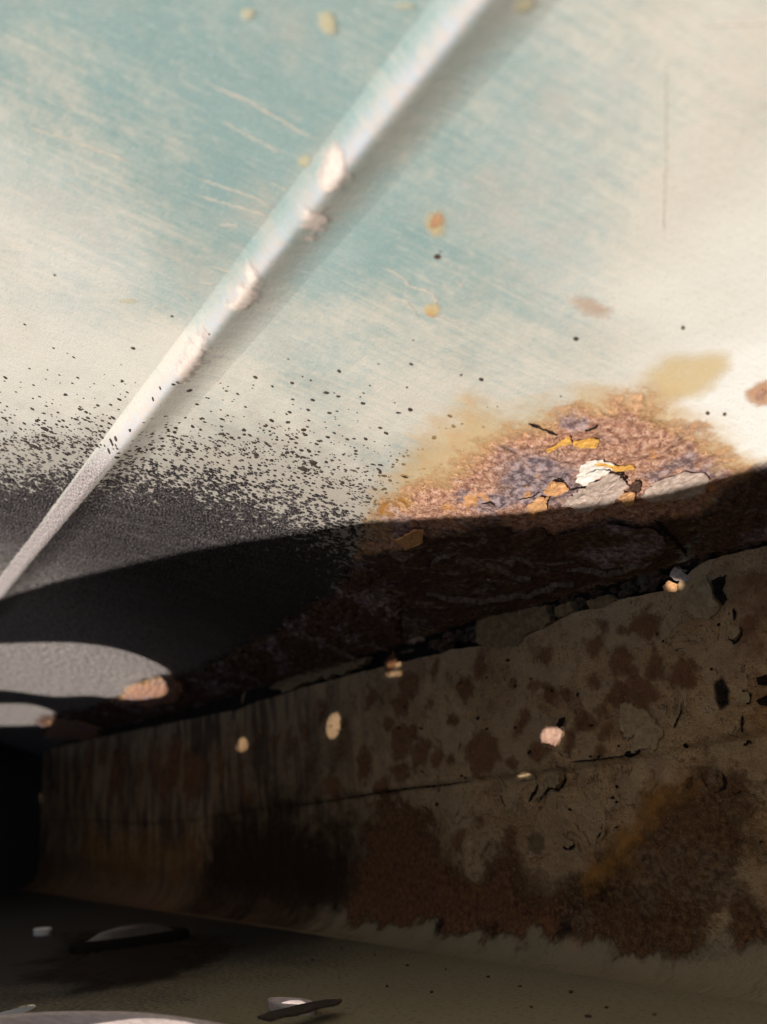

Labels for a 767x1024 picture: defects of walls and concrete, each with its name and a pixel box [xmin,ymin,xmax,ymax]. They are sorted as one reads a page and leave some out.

peeling [320,146,345,192]
peeling [227,265,257,311]
peeling [176,333,204,383]
corrosion [35,359,767,797]
crack [573,750,640,762]
crack [285,780,473,810]
corrosion [556,758,767,960]